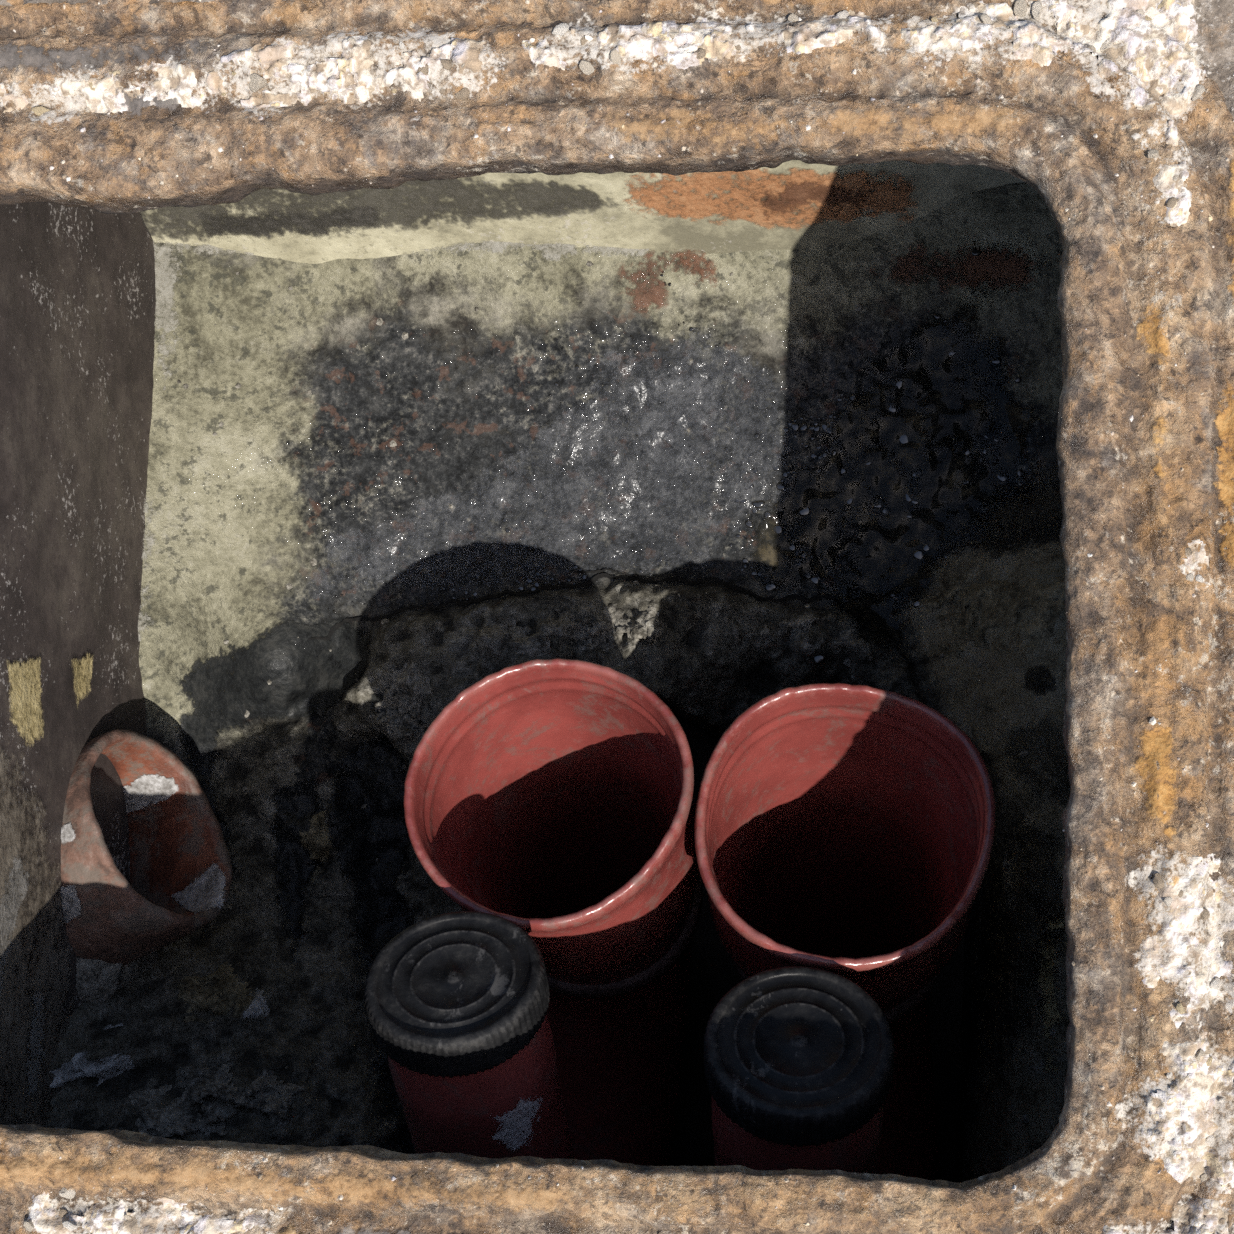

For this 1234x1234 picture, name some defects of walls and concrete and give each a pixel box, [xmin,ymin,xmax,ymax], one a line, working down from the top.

leakage [179,615,371,880]
leakage [272,693,414,977]
crack [308,568,909,660]
leakage [752,306,1063,654]